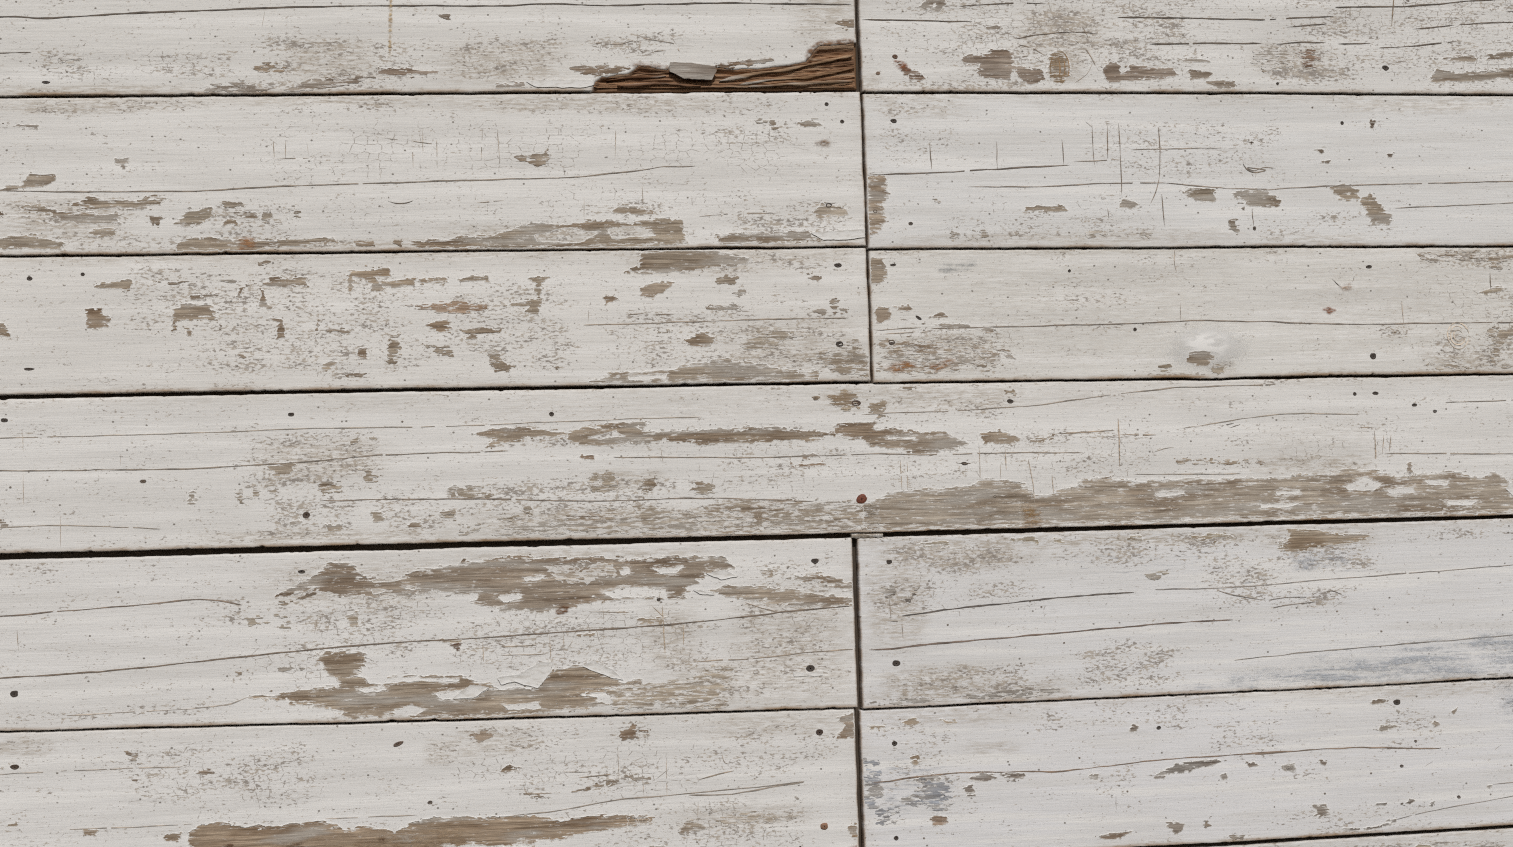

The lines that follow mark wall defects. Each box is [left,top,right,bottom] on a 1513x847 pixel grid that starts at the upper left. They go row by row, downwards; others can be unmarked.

peeling [669,57,774,80]
peeling [961,48,1046,85]
peeling [1100,54,1237,90]
peeling [1429,49,1513,85]
peeling [1181,187,1282,235]
peeling [1329,183,1394,226]
peeling [0,172,375,341]
peeling [393,175,891,312]
peeling [245,257,1513,745]
crack [0,564,1513,679]
crack [67,697,247,716]
peeling [162,764,801,847]